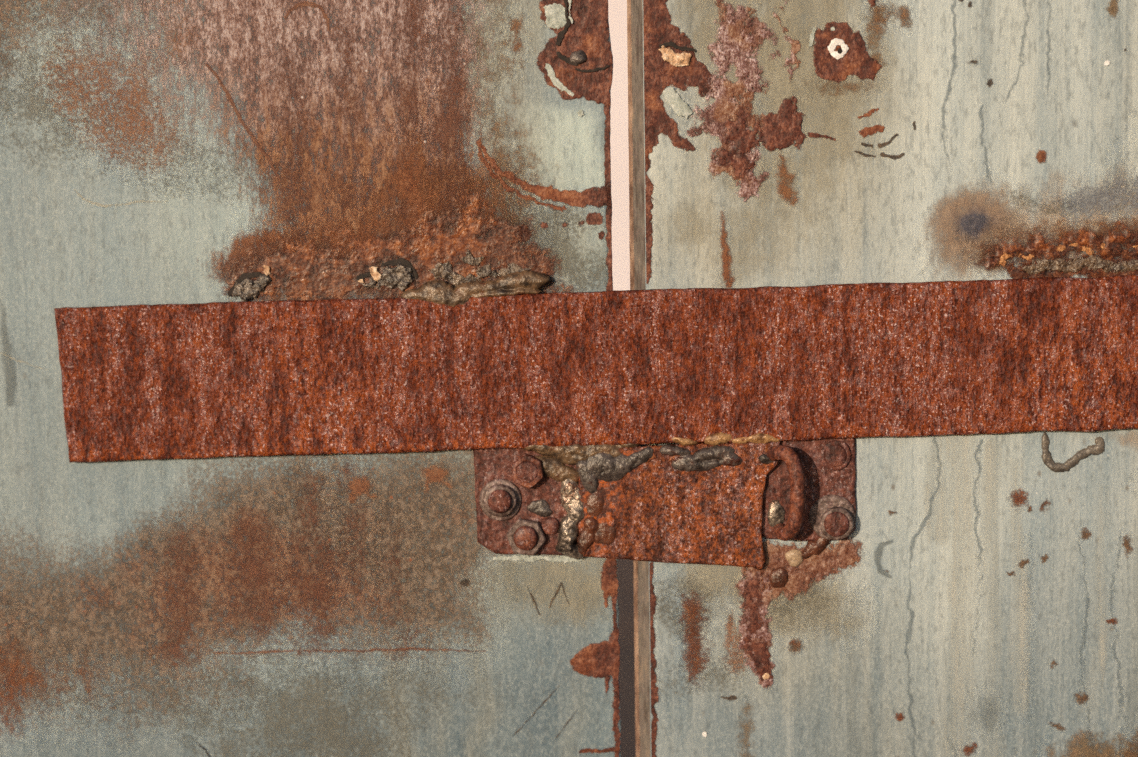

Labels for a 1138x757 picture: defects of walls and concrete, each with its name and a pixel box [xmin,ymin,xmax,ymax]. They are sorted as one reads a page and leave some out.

corrosion [0,0,613,301]
corrosion [720,214,734,288]
corrosion [686,0,886,205]
corrosion [0,450,495,729]
corrosion [579,689,621,757]
corrosion [601,558,618,630]
corrosion [649,538,862,757]
corrosion [1048,722,1138,757]